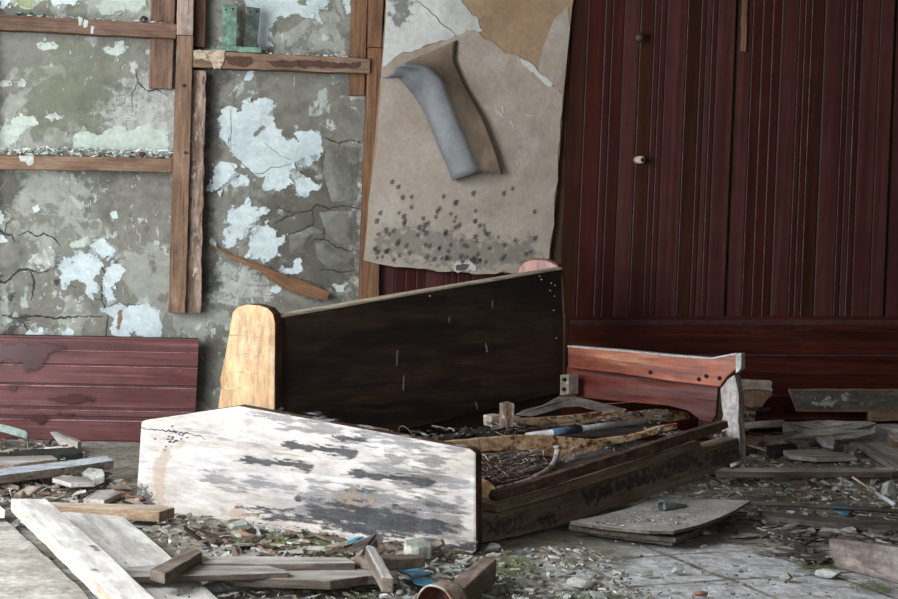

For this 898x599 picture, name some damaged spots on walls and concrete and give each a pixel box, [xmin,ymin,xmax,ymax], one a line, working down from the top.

peeling [0,0,79,11]
peeling [244,0,330,50]
peeling [0,112,173,158]
peeling [205,97,324,198]
water stain [201,56,361,306]
crack [0,218,139,336]
peeling [28,235,163,337]
peeling [209,197,303,275]
crack [275,204,358,273]
water stain [373,180,413,262]
water stain [416,194,516,263]
water stain [0,313,66,373]